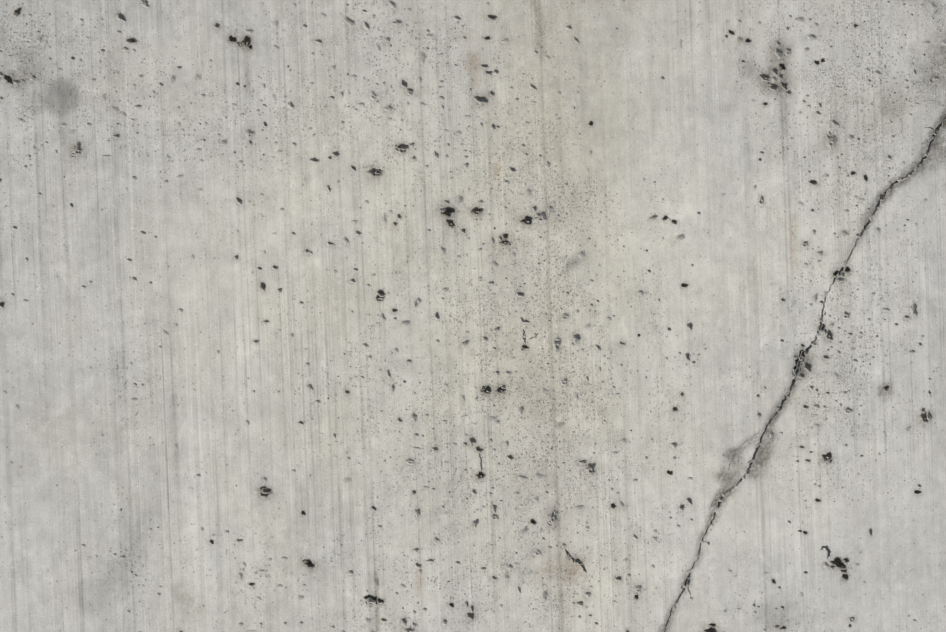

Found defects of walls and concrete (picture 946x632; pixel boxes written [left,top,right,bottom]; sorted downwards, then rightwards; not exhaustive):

crack [661,117,946,632]